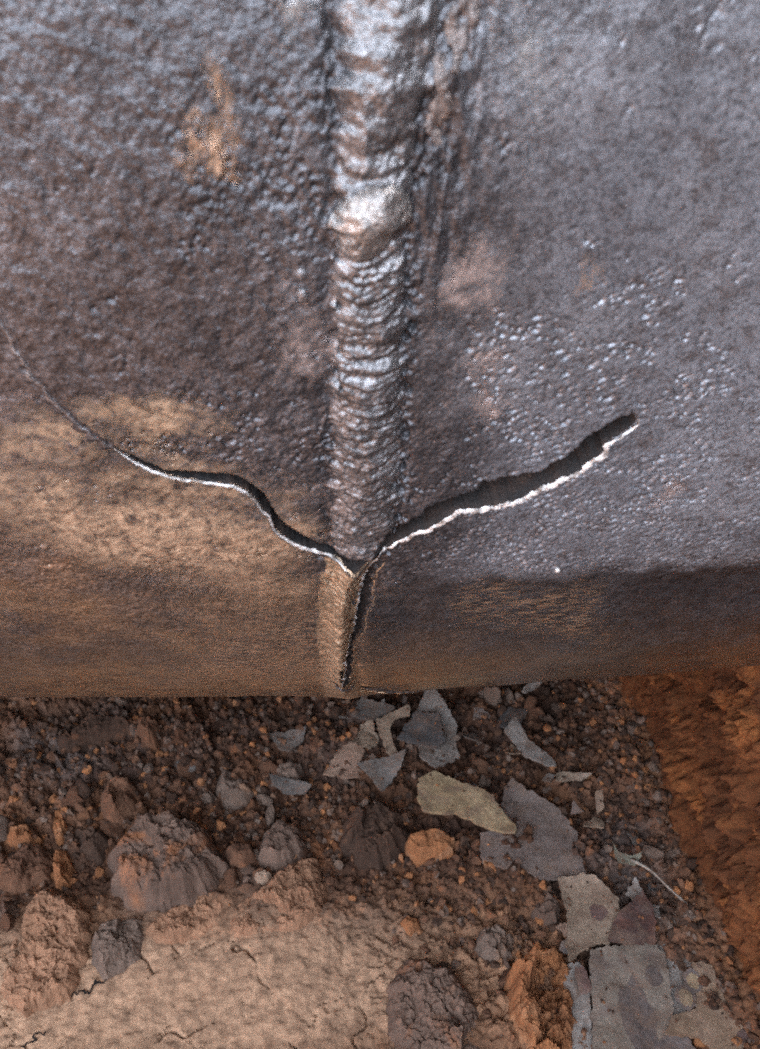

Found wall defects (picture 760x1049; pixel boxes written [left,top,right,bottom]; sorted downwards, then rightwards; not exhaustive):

rust [191,131,222,173]
crack [0,309,641,694]